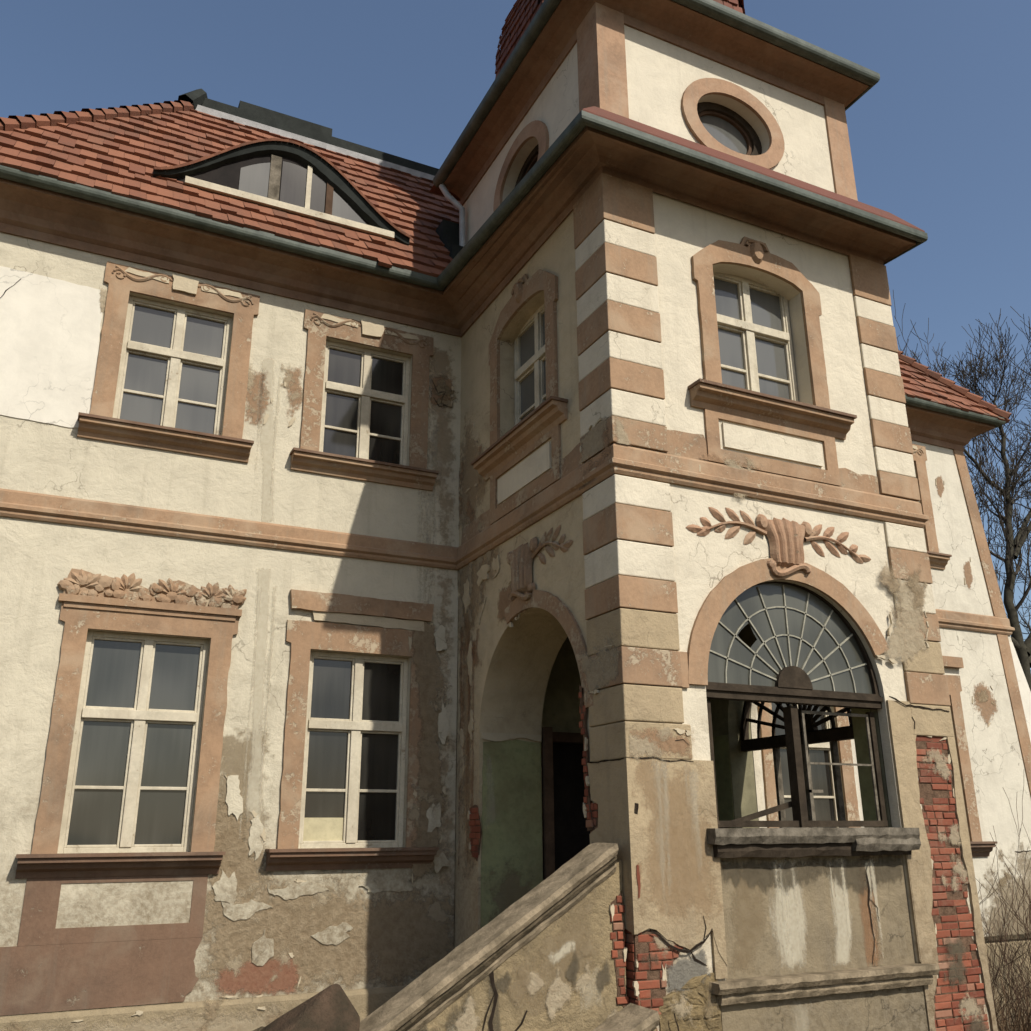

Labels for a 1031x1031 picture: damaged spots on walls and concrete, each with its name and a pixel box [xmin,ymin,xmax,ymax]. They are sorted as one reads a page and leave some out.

peeling [245,367,273,425]
peeling [281,364,304,427]
peeling [935,477,945,497]
peeling [963,558,973,588]
flaking render [875,564,929,664]
peeling [972,683,996,727]
flaking render [579,685,598,833]
flaking render [0,620,456,1031]
flaking render [915,735,990,1031]
flaking render [609,891,684,1015]
crack [651,916,713,966]
crack [483,971,527,1031]